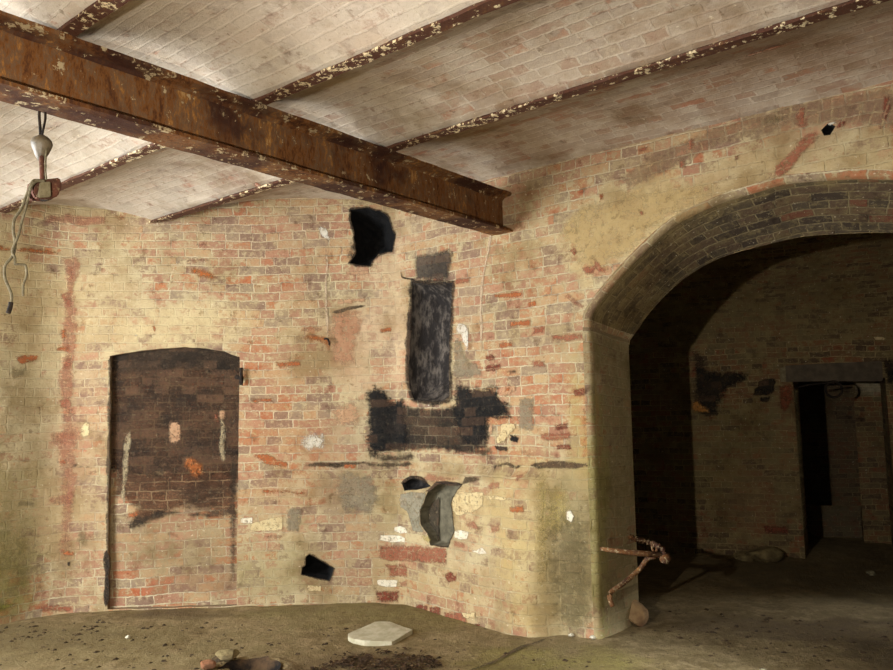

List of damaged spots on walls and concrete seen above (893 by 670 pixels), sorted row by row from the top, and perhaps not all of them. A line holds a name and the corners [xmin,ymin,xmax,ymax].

hole [348,206,396,267]
leakage [121,433,131,498]
leakage [130,511,178,528]
leakage [192,411,237,565]
hole [301,554,335,581]
flaking render [376,474,499,602]